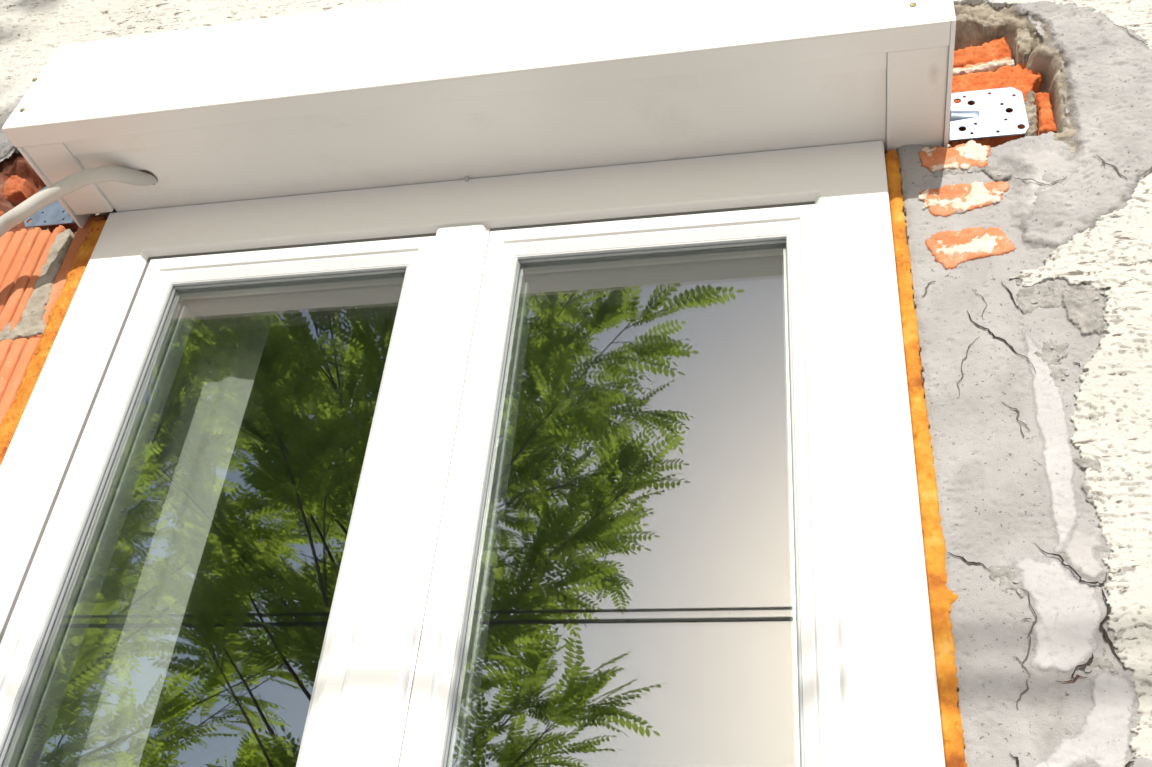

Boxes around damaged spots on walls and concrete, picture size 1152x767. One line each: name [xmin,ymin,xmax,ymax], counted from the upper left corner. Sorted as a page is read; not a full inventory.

spalling [918,1,1081,217]
spalling [0,151,46,217]
flaking render [925,227,1016,269]
flaking render [0,209,117,425]
crack [957,281,1036,396]
spalling [1034,339,1069,387]
crack [1002,402,1030,437]
spalling [1073,456,1102,503]
crack [948,552,988,569]
peeling [1063,527,1107,578]
crack [1037,545,1128,682]
crack [1016,588,1037,709]